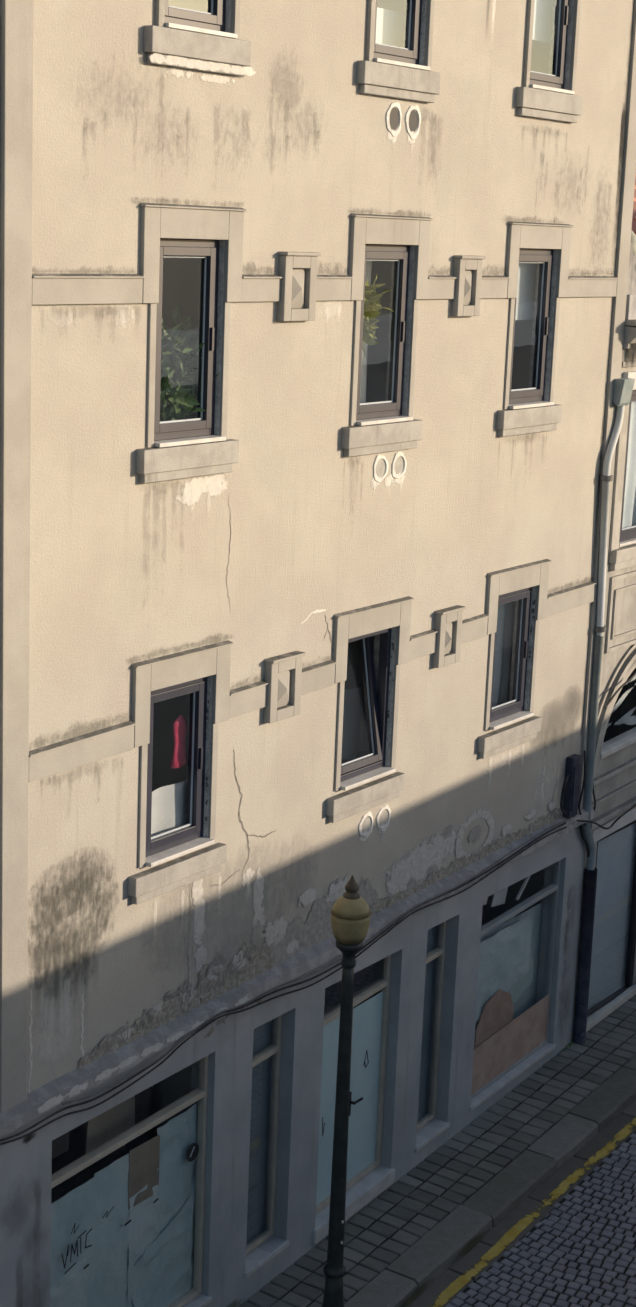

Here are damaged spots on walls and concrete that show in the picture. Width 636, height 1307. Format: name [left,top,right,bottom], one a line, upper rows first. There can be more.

peeling [175,474,228,507]
water stain [32,861,112,977]
crack [179,749,278,979]
spalling [37,799,563,1113]